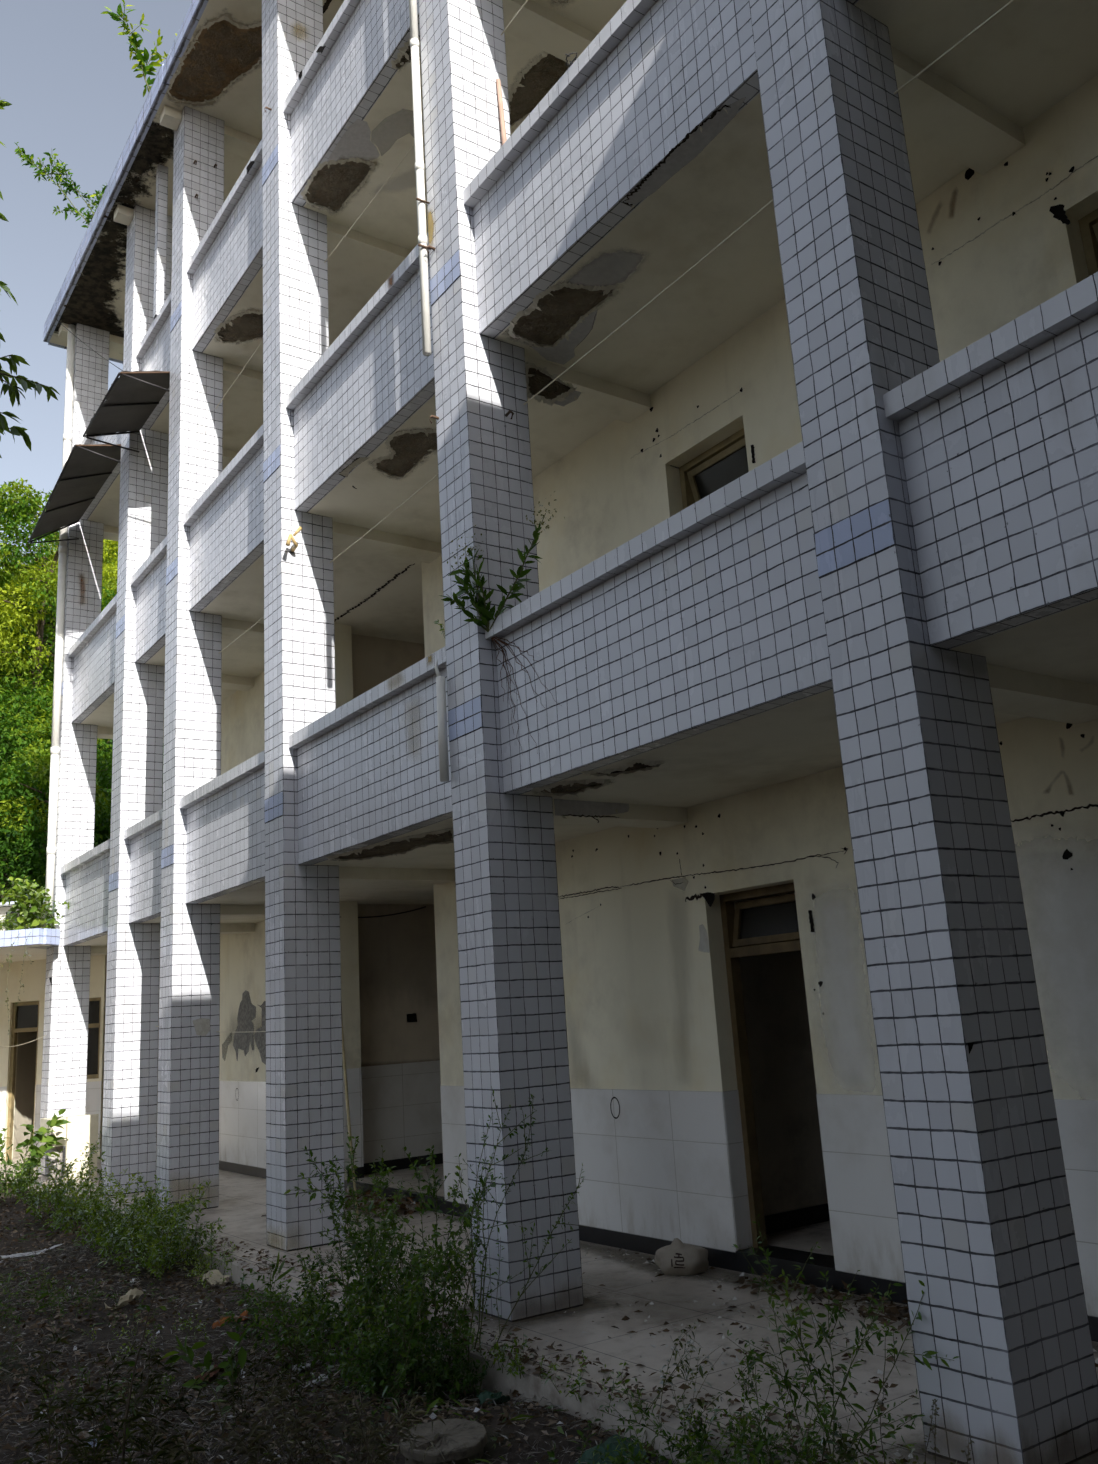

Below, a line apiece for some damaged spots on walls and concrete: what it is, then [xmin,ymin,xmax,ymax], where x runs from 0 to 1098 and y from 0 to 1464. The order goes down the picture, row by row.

spalling [167,13,262,106]
spalling [508,52,570,128]
spalling [301,157,377,212]
spalling [213,309,263,345]
spalling [508,282,620,406]
spalling [339,428,437,489]
crack [334,563,415,622]
peeling [530,759,665,819]
crack [1011,804,1098,822]
spalling [326,828,454,862]
crack [559,848,848,914]
peeling [233,990,266,1073]